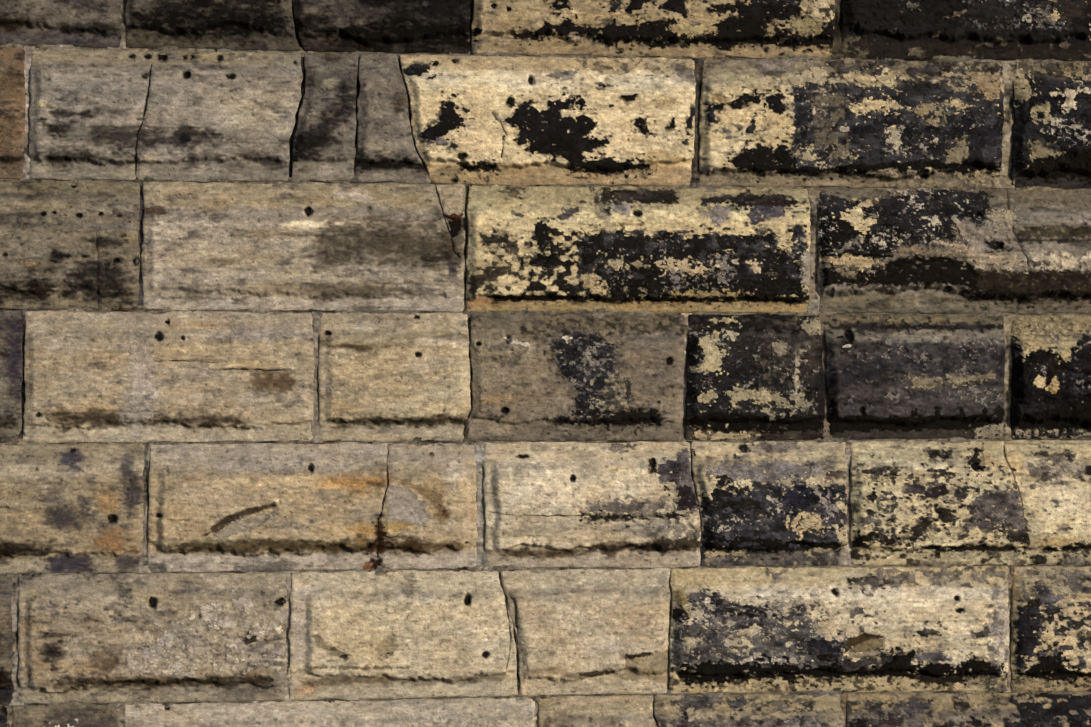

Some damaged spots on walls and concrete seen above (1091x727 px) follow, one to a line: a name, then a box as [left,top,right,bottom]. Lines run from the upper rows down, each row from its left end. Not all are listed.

crack [134,64,152,175]
peeling [401,57,457,82]
crack [435,184,461,259]
peeling [414,0,1091,727]
crack [371,444,399,558]
corrosion [350,513,422,570]
crack [499,572,520,694]